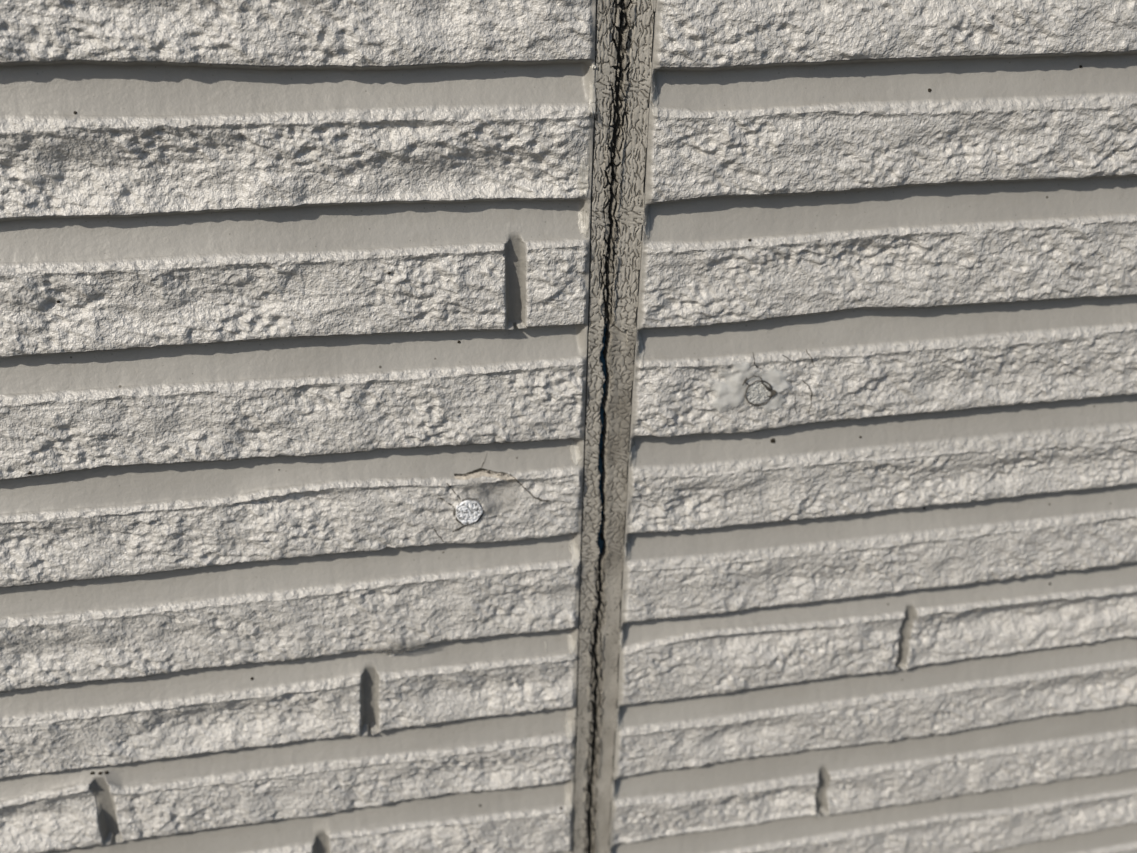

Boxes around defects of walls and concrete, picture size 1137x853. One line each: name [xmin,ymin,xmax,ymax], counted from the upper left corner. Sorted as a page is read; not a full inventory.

crack [572,0,655,853]